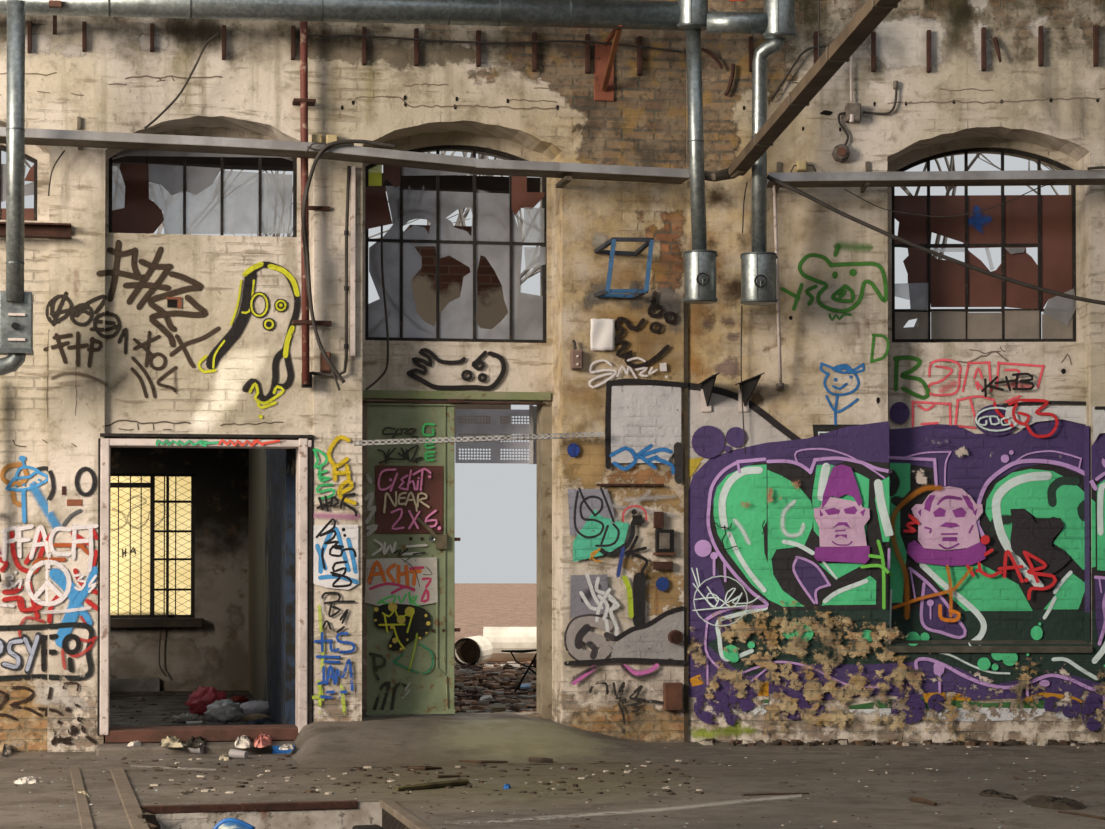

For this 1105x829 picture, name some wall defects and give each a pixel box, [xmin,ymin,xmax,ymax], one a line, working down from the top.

flaking render [308,38,497,83]
spalling [503,26,690,187]
spalling [701,30,767,172]
spalling [767,41,797,101]
spalling [630,210,685,332]
spalling [0,674,89,752]
peeling [688,601,974,741]
peeling [1010,657,1047,713]
peeling [1094,670,1105,721]